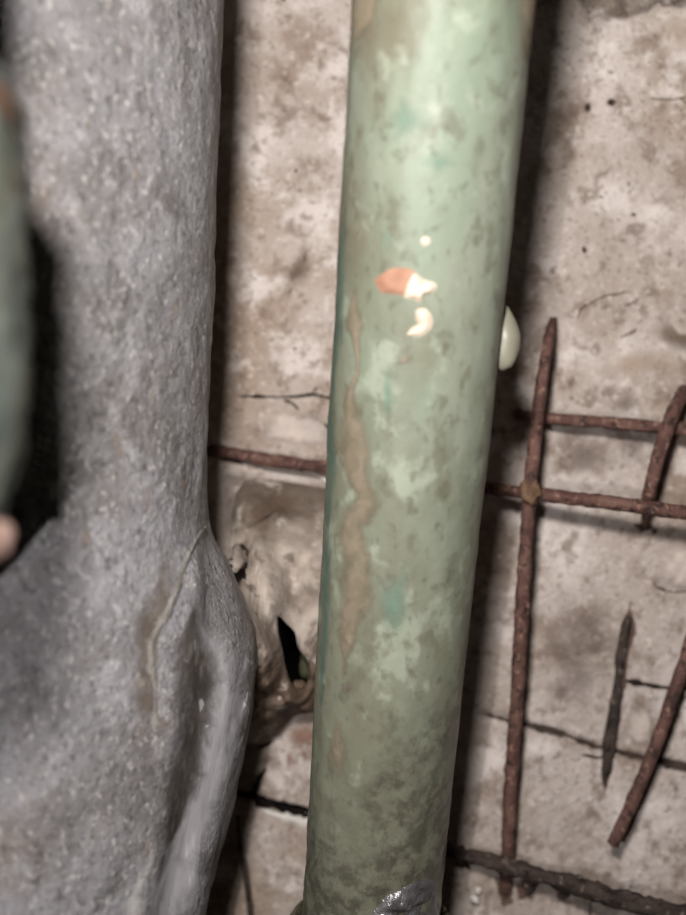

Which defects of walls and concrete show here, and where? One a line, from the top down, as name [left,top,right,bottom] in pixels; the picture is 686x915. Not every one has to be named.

crack [236,387,330,427]
rust [495,877,529,906]